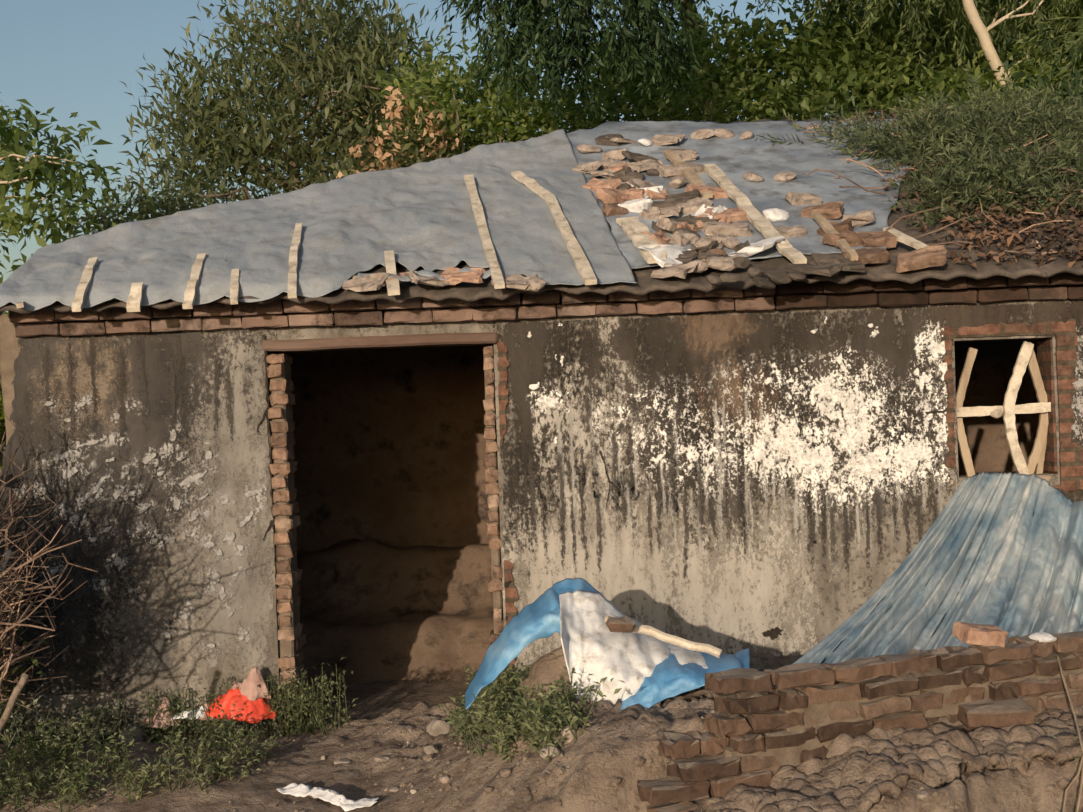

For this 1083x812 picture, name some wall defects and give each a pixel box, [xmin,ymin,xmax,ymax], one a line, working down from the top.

damp [0,329,277,698]
peeling [14,394,267,654]
damp [514,632,561,665]
peeling [528,382,577,414]
damp [493,305,958,656]
peeling [592,318,1083,516]